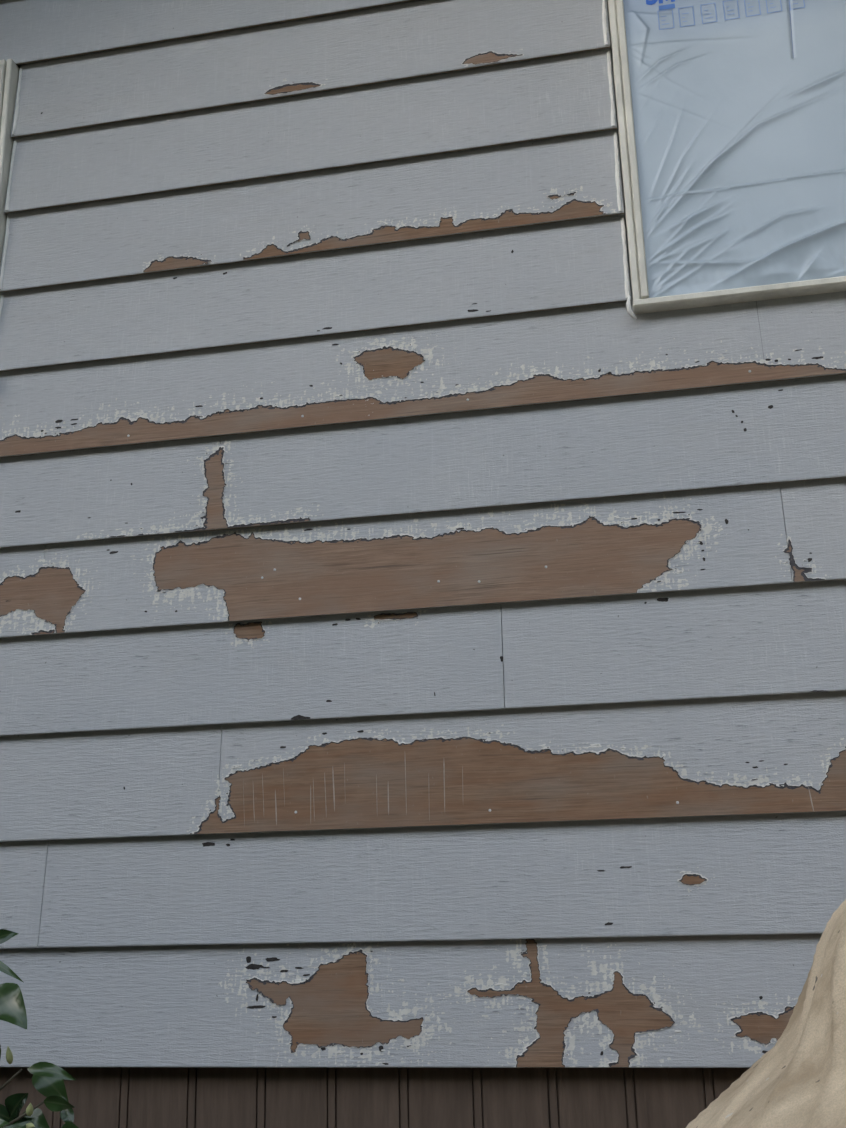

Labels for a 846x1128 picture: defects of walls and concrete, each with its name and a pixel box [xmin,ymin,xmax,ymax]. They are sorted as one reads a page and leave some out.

peeling [264,79,328,95]
peeling [462,47,524,67]
peeling [240,183,617,260]
peeling [142,251,227,279]
peeling [0,331,846,648]
peeling [187,723,846,847]
peeling [218,939,798,1067]